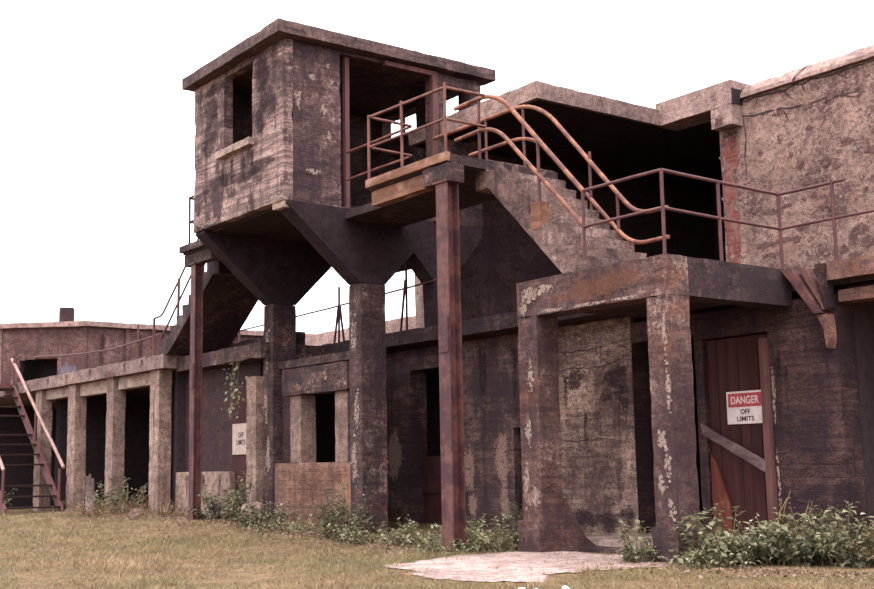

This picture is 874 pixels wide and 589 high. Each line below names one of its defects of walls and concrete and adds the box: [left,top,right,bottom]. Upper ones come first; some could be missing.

damp [203,79,227,158]
damp [255,58,275,133]
crack [742,60,874,178]
damp [202,151,275,195]
flaking render [719,134,792,263]
spalling [789,137,874,215]
spalling [756,225,809,257]
peeling [661,310,672,413]
peeling [657,429,677,522]